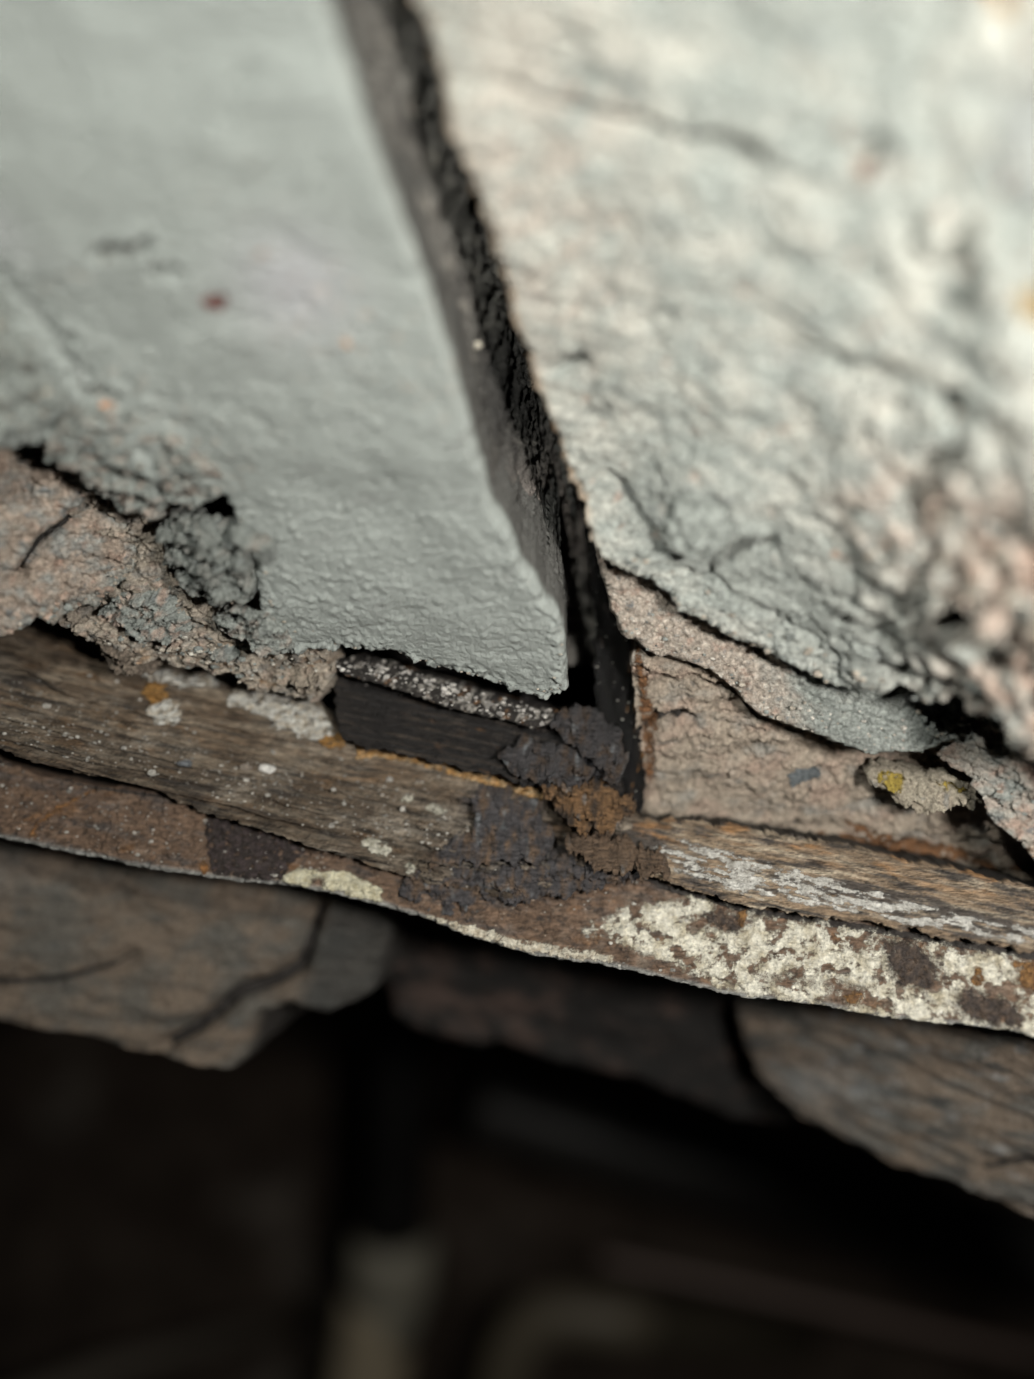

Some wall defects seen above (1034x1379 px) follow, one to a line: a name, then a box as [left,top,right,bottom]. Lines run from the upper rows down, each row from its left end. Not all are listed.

spalling [0,403,345,703]
rust [635,644,658,781]
spalling [593,541,1034,857]
leakage [426,839,1034,1037]
rust [815,819,1022,875]